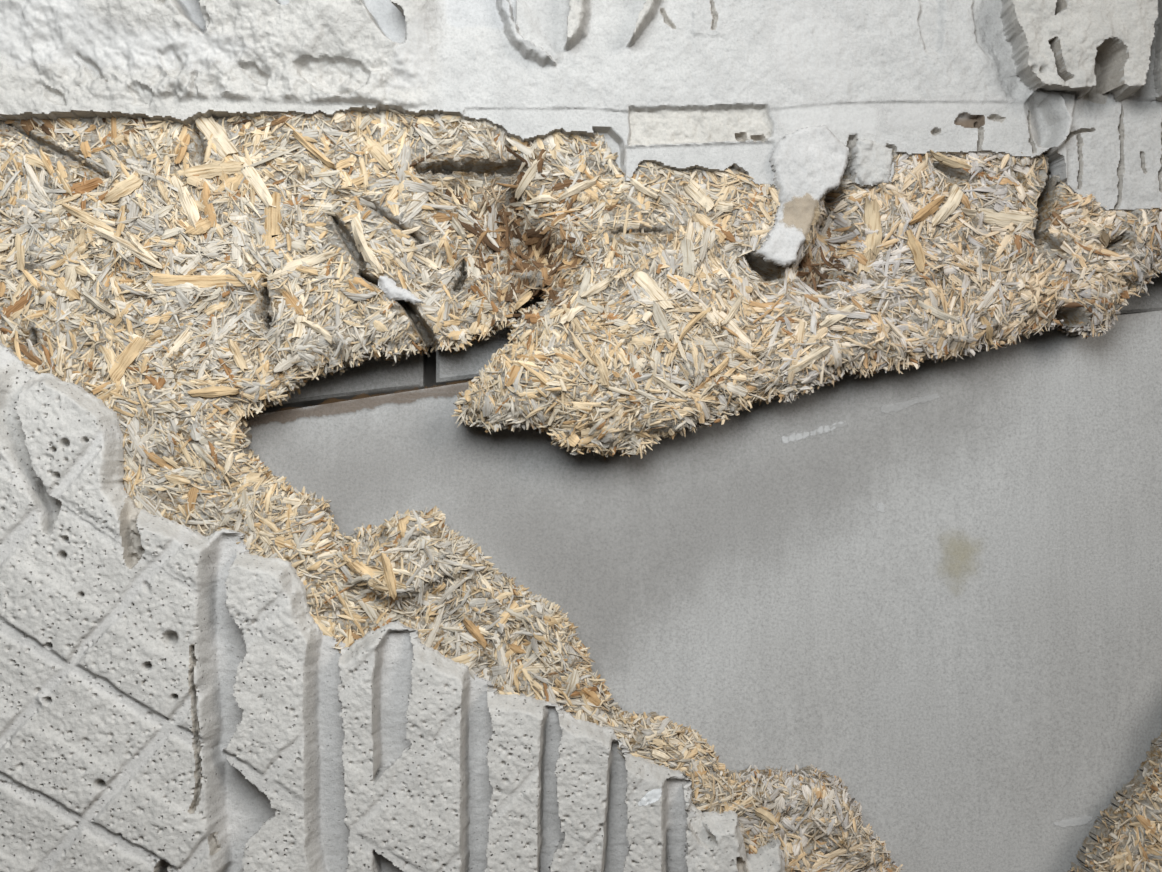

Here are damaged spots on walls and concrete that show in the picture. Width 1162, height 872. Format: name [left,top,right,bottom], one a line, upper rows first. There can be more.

spalling [378,155,585,351]
peeling [735,125,866,295]
crack [188,644,221,856]
crack [154,859,172,872]